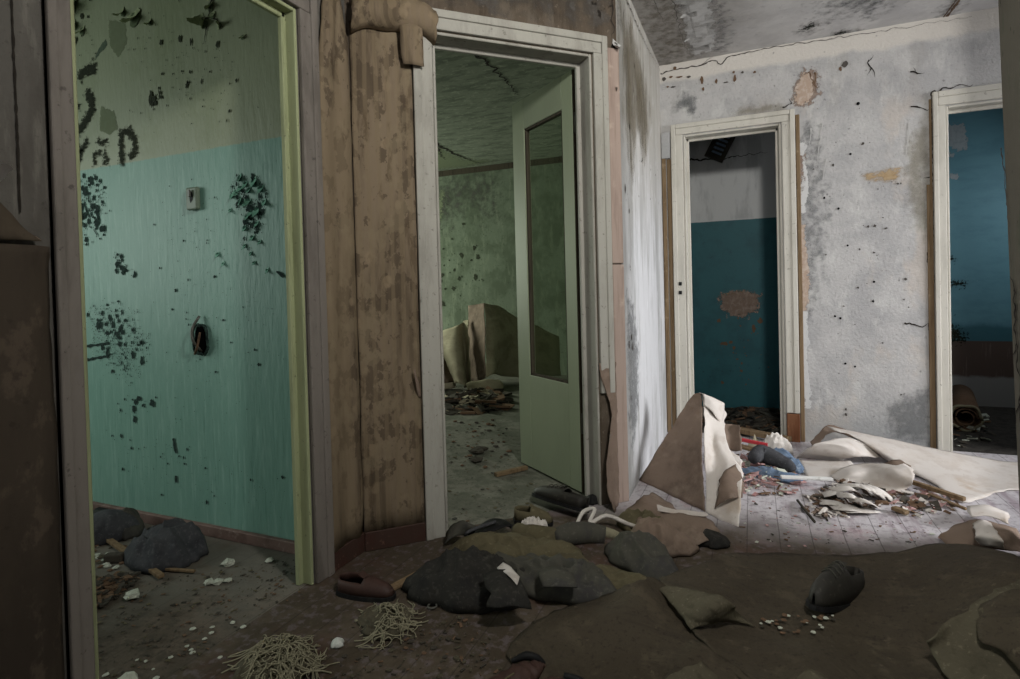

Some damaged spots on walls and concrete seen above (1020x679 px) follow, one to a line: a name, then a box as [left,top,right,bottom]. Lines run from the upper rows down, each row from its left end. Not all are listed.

peeling [74,0,162,60]
peeling [161,3,229,100]
peeling [100,106,118,135]
peeling [129,80,167,118]